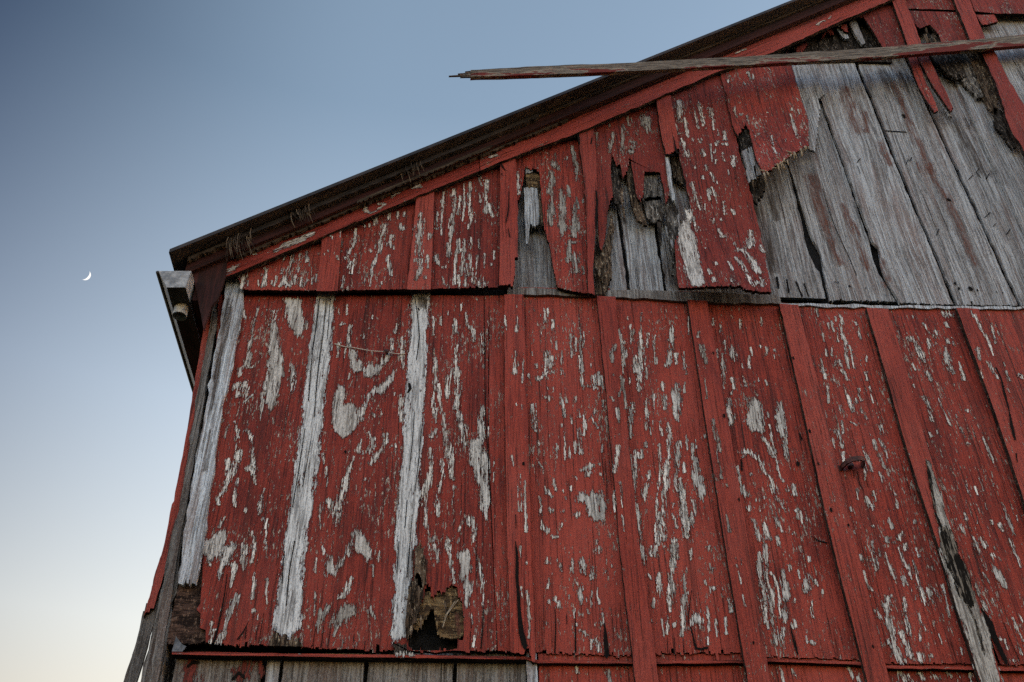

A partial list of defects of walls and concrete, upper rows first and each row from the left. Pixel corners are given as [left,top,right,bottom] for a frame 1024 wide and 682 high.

peeling [545,145,585,275]
peeling [674,99,767,287]
peeling [733,98,802,154]
peeling [203,175,496,659]
crack [484,294,528,650]
peeling [510,308,824,653]
peeling [810,290,1024,682]